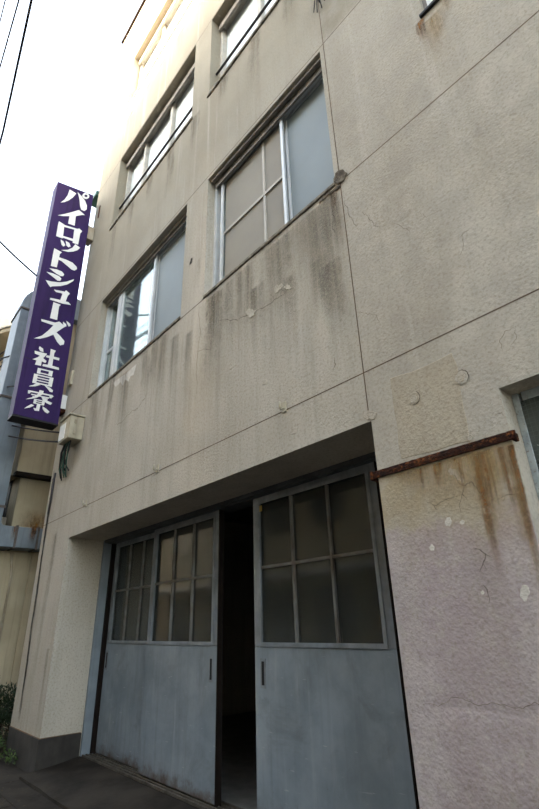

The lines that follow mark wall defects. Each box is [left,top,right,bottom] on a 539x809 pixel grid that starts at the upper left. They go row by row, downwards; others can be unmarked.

corrosion [370,430,533,543]